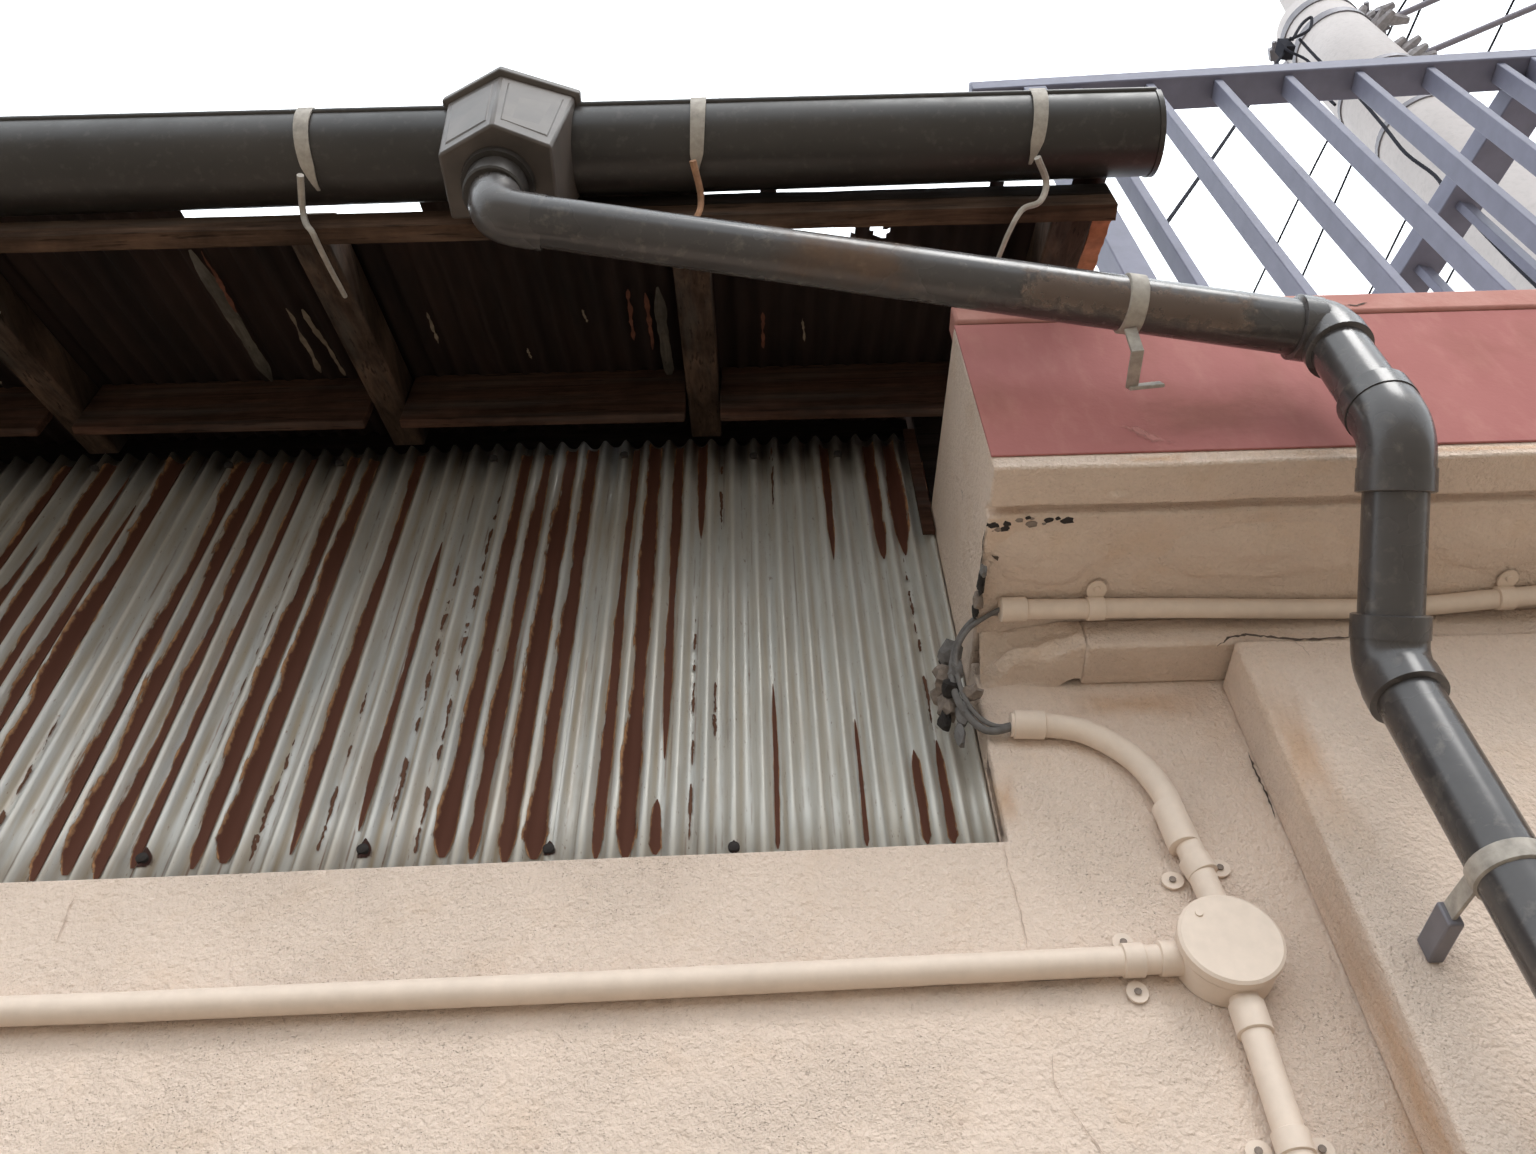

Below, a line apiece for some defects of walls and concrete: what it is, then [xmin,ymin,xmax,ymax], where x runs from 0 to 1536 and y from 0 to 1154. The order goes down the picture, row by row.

corrosion [0,457,190,795]
corrosion [29,457,319,881]
corrosion [184,456,380,869]
corrosion [289,455,426,855]
corrosion [357,542,462,858]
corrosion [414,450,599,863]
corrosion [592,443,723,859]
corrosion [772,686,780,849]
corrosion [862,439,921,651]
corrosion [912,676,959,844]
spalling [986,516,1074,532]
crack [1218,633,1349,656]